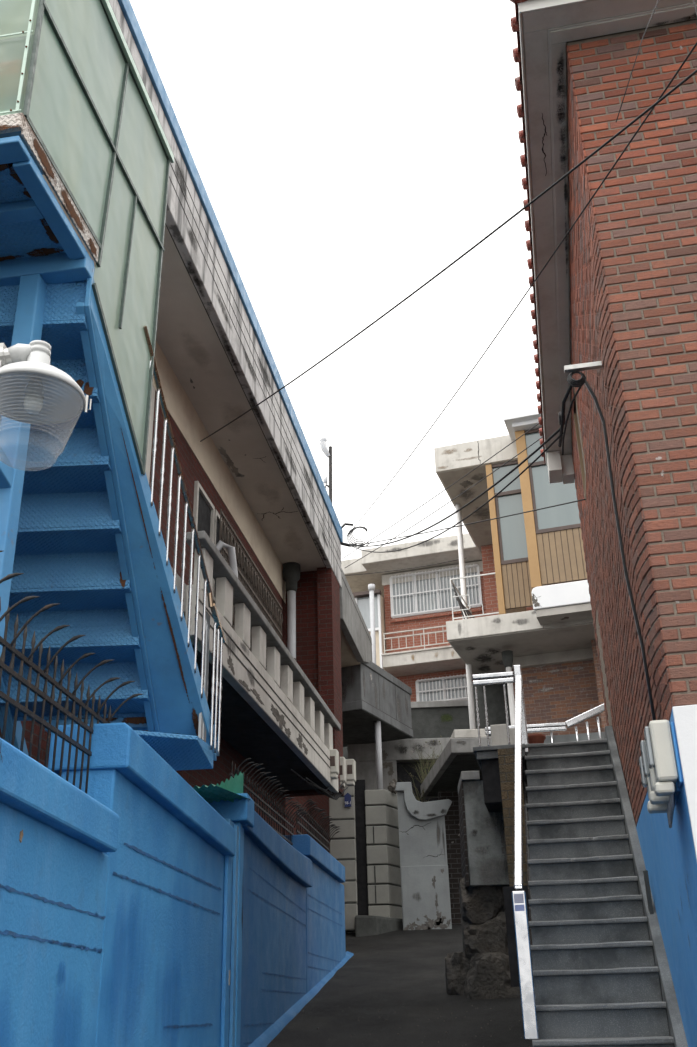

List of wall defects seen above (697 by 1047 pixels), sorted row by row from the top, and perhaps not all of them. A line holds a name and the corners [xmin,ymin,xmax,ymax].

rust [34,138,97,256]
crack [540,114,548,176]
leakage [557,56,566,164]